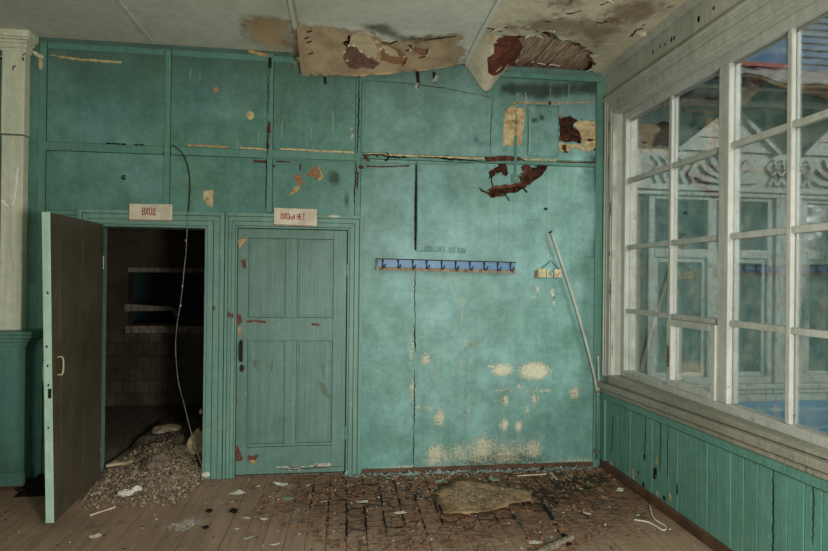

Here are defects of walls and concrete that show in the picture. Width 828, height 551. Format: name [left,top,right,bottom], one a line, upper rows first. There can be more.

peeling [21,51,122,69]
damp [245,17,465,77]
peeling [343,32,456,69]
crack [485,0,614,34]
crack [629,24,647,37]
spalling [367,101,596,201]
peeling [203,190,213,208]
peeling [290,167,323,195]
peeling [228,311,266,335]
peeling [408,339,446,427]
crack [309,271,572,537]
peeling [229,359,624,551]